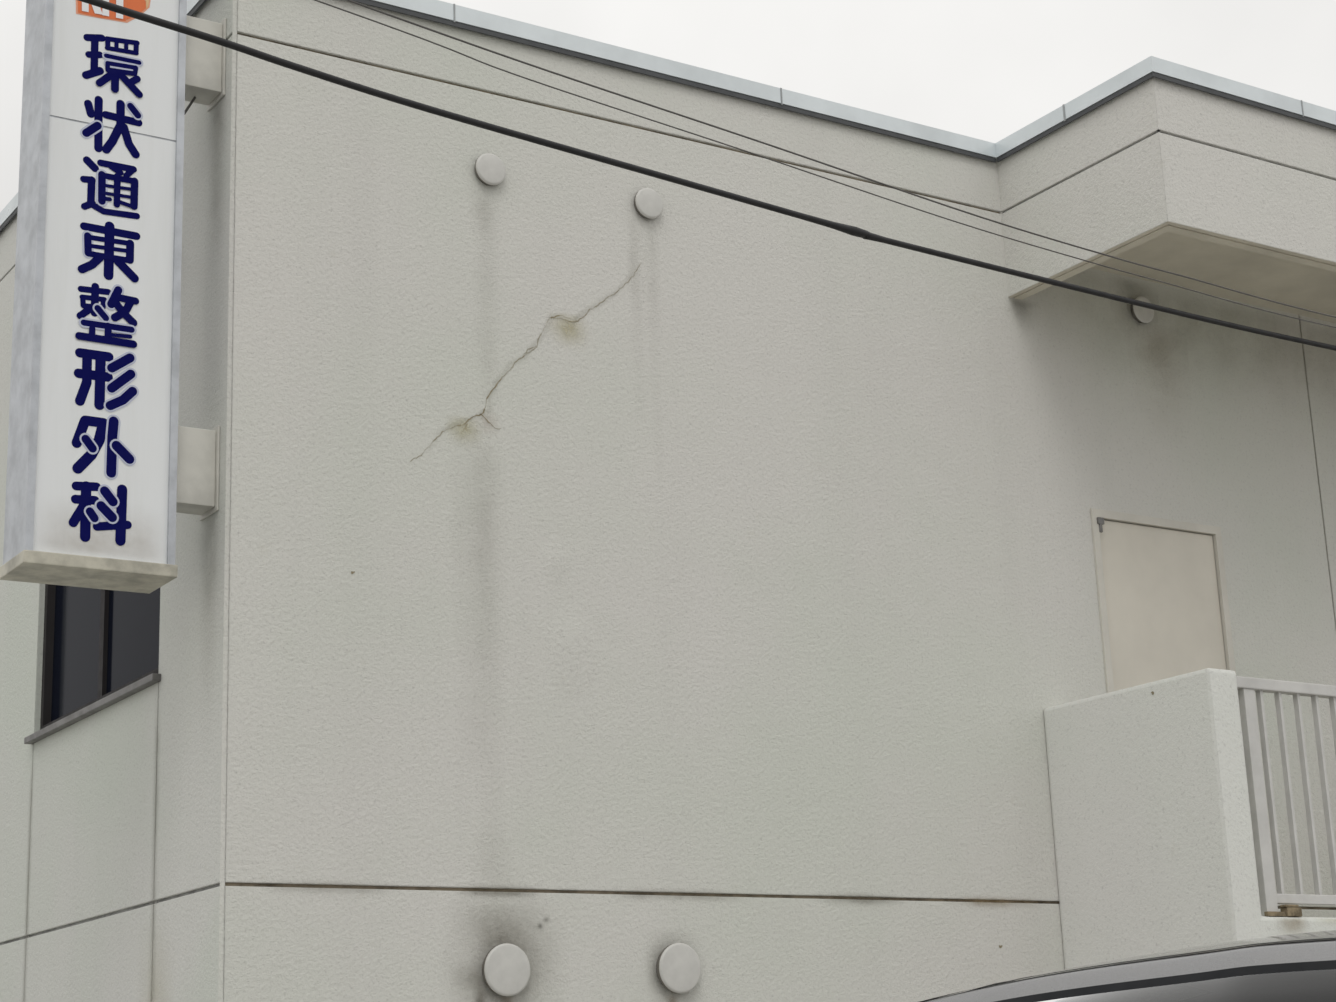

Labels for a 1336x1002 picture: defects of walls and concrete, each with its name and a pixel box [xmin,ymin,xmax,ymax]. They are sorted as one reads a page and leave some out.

crack [410,265,640,462]